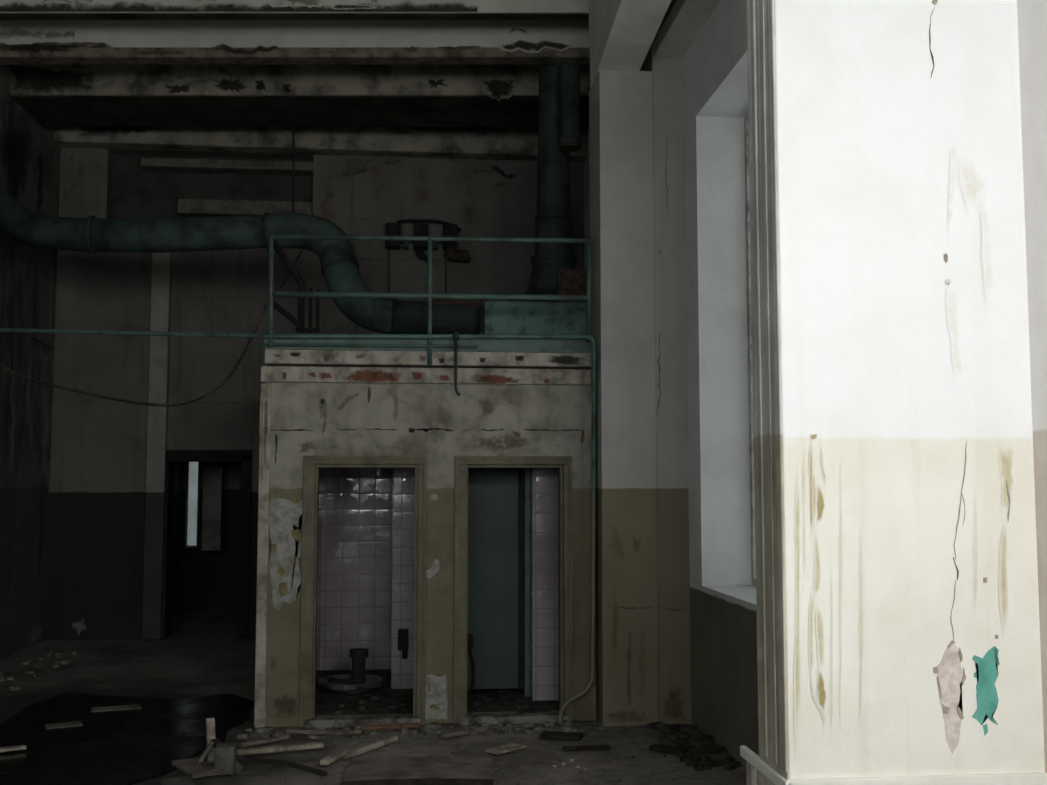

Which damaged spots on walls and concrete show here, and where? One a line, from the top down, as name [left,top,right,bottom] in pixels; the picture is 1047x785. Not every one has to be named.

damp [0,27,105,96]
damp [0,0,477,12]
crack [929,0,938,77]
corrosion [306,368,423,404]
peeling [268,497,303,610]
damp [794,434,843,758]
crack [950,441,967,640]
damp [999,445,1014,634]
peeling [933,635,1000,754]